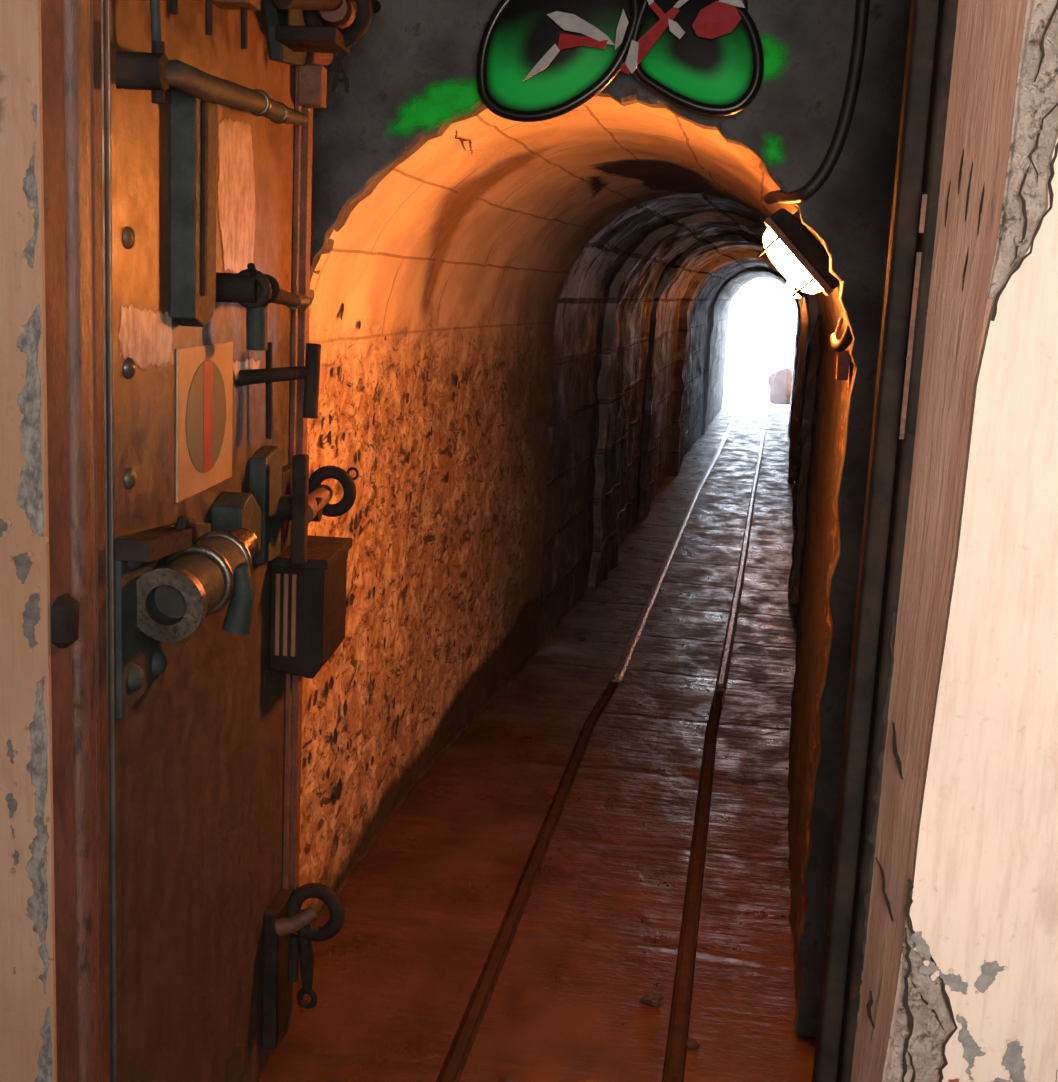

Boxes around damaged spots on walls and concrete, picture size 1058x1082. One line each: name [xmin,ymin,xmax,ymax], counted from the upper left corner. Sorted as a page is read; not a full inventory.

peeling [22,142,39,269]
spalling [987,0,1058,321]
peeling [16,305,49,543]
peeling [8,551,40,653]
peeling [3,667,53,993]
peeling [35,1007,52,1082]
spalling [881,879,1008,1082]
peeling [992,1035,1026,1082]